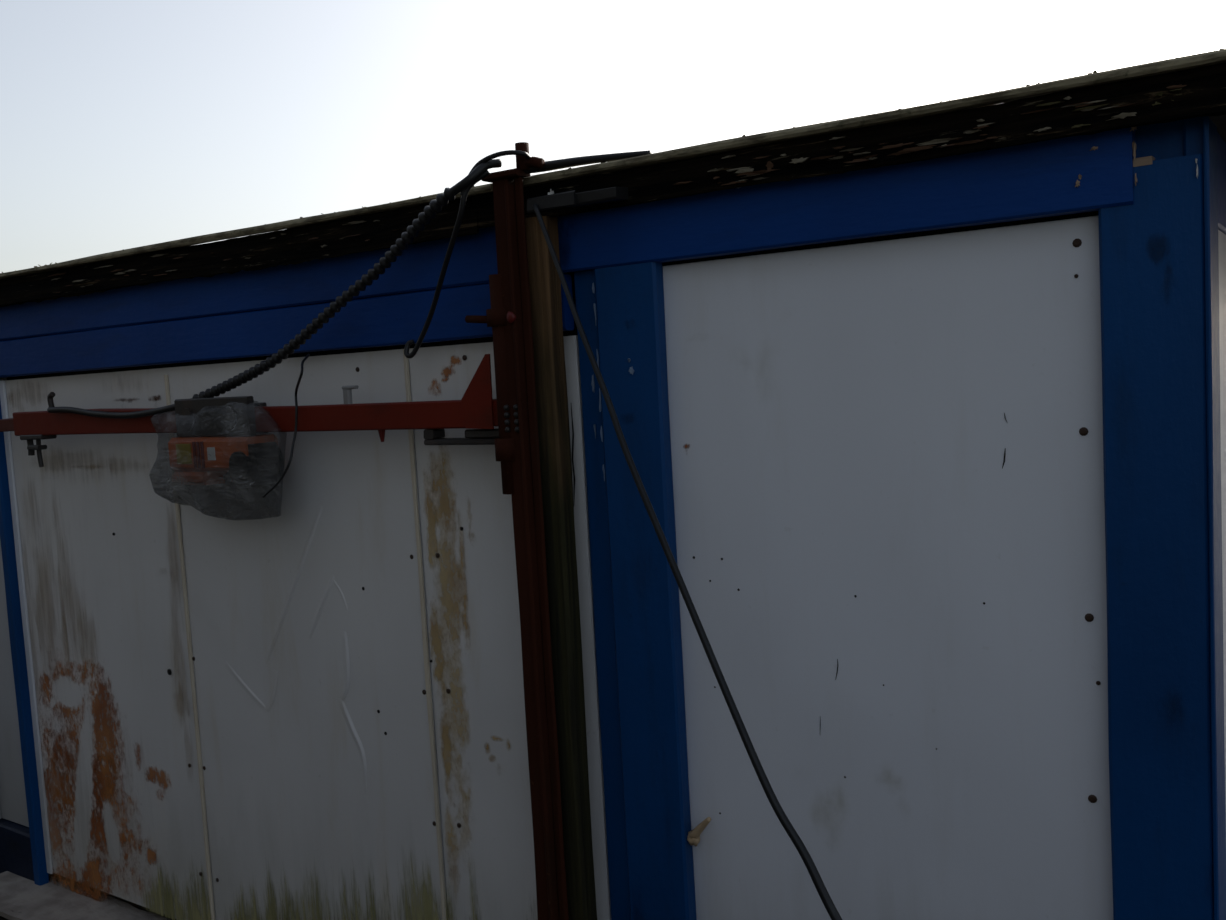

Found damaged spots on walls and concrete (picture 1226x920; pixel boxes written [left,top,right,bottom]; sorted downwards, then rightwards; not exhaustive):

peeling [707,119,998,185]
peeling [1021,84,1186,186]
corrosion [39,662,170,901]